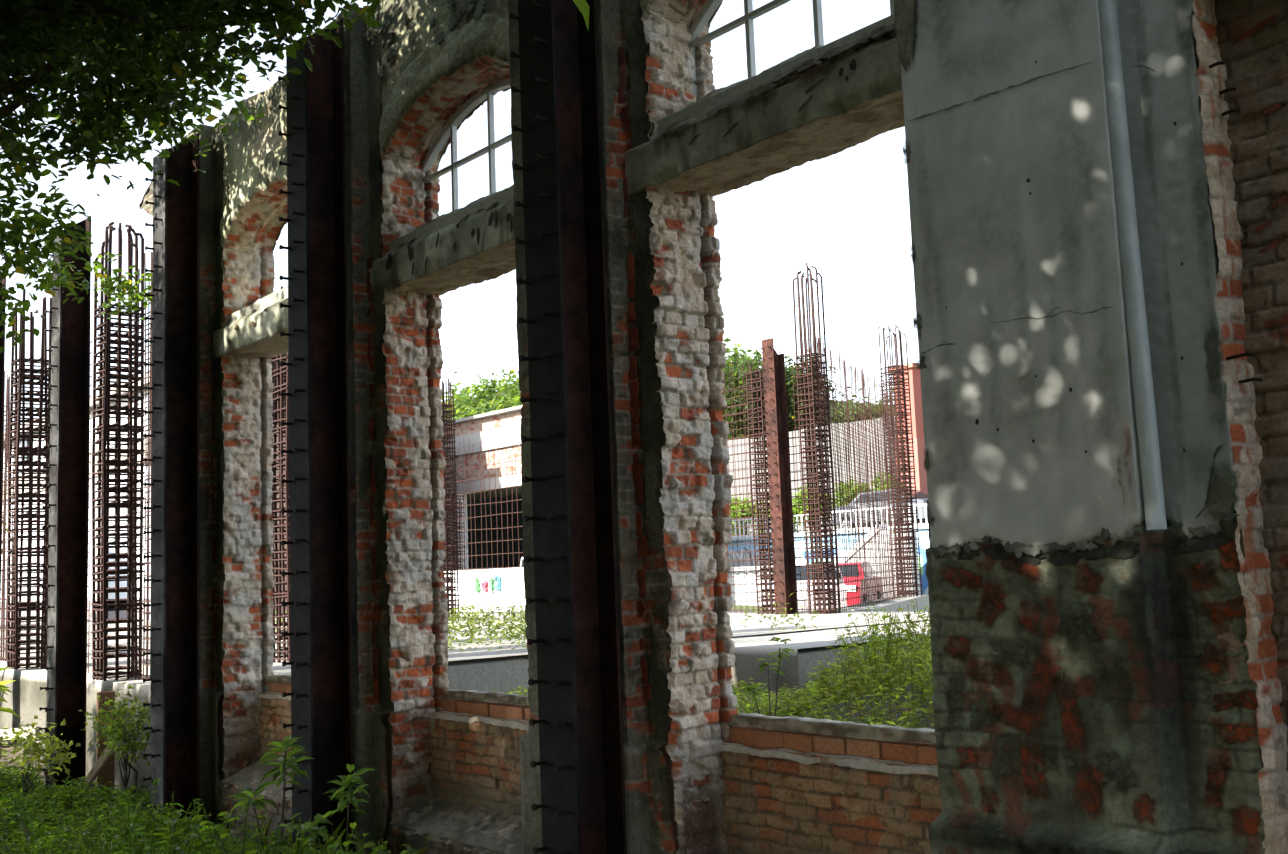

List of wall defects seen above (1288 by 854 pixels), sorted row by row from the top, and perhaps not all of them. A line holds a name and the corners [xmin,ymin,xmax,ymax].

crack [909,61,1096,121]
flaking render [902,140,911,165]
spalling [366,202,513,317]
flaking render [913,313,922,338]
flaking render [914,355,927,369]
crack [996,305,1116,323]
flaking render [1204,322,1223,380]
flaking render [930,444,1246,824]
flaking render [1212,689,1259,745]
flaking render [1204,760,1260,836]